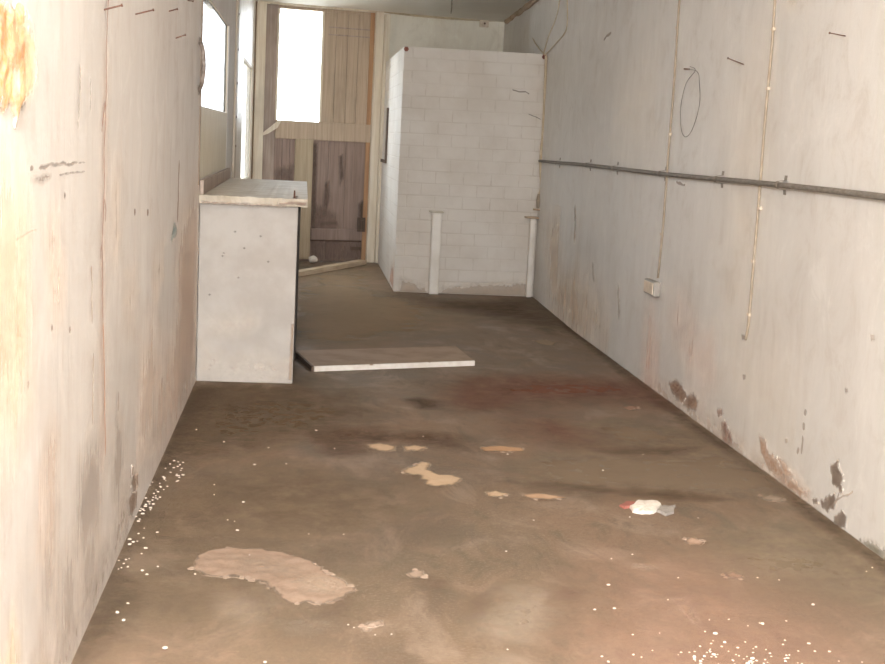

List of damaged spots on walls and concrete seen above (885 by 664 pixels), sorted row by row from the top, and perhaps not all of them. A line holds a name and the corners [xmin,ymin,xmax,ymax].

spalling [667,379,697,411]
spalling [758,437,849,529]